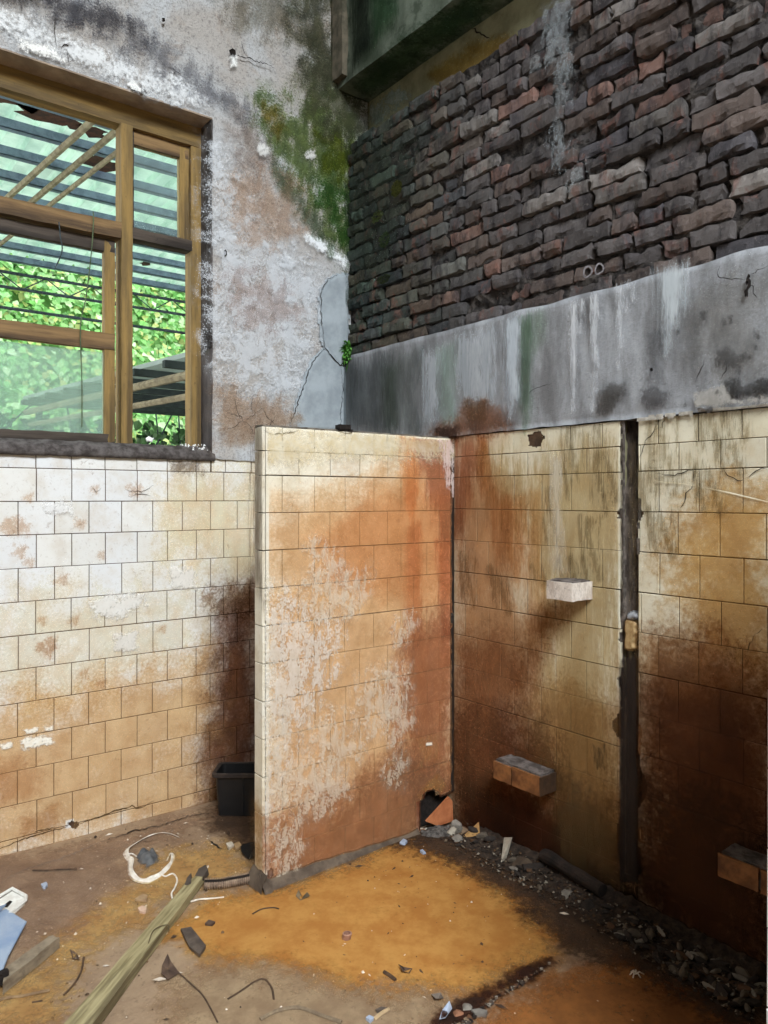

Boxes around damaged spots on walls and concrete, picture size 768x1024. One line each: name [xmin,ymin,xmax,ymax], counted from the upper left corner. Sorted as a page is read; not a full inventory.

leakage [0,10,210,106]
leakage [253,0,411,267]
efflorescence [543,0,573,165]
crack [228,275,344,435]
corrosion [436,426,458,440]
leakage [421,317,522,420]
leakage [570,294,614,412]
efflorescence [661,268,687,354]
leakage [694,378,768,408]
crack [659,470,695,507]
spalling [419,788,453,831]
corrosion [451,639,768,969]